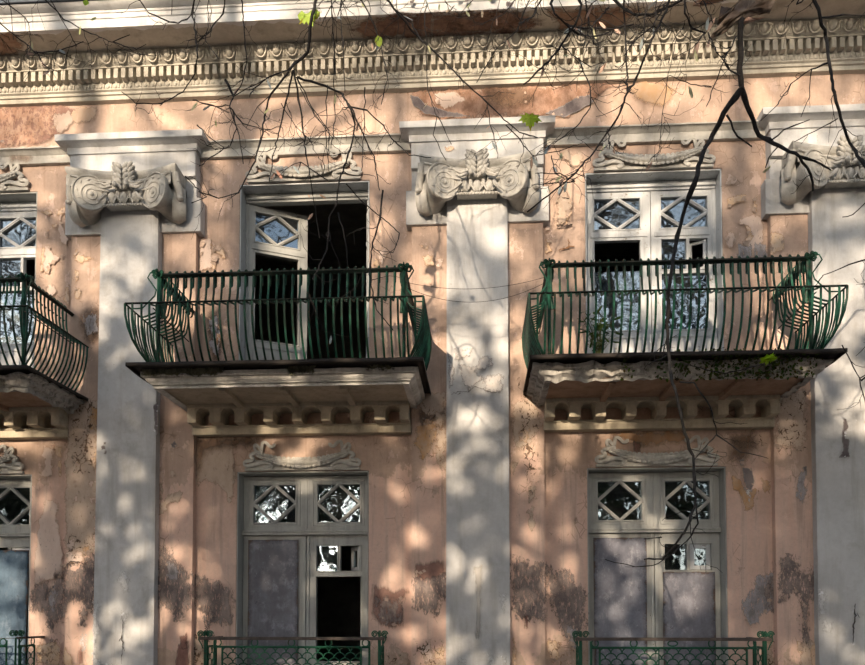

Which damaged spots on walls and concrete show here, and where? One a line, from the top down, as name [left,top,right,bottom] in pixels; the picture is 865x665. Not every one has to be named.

spalling [0,105,97,148]
peeling [40,207,94,306]
peeling [447,347,504,393]
spalling [839,419,850,458]
peeling [28,398,116,665]
spalling [158,546,236,665]
spalling [373,561,446,628]
spalling [500,554,588,665]
spalling [741,553,835,665]